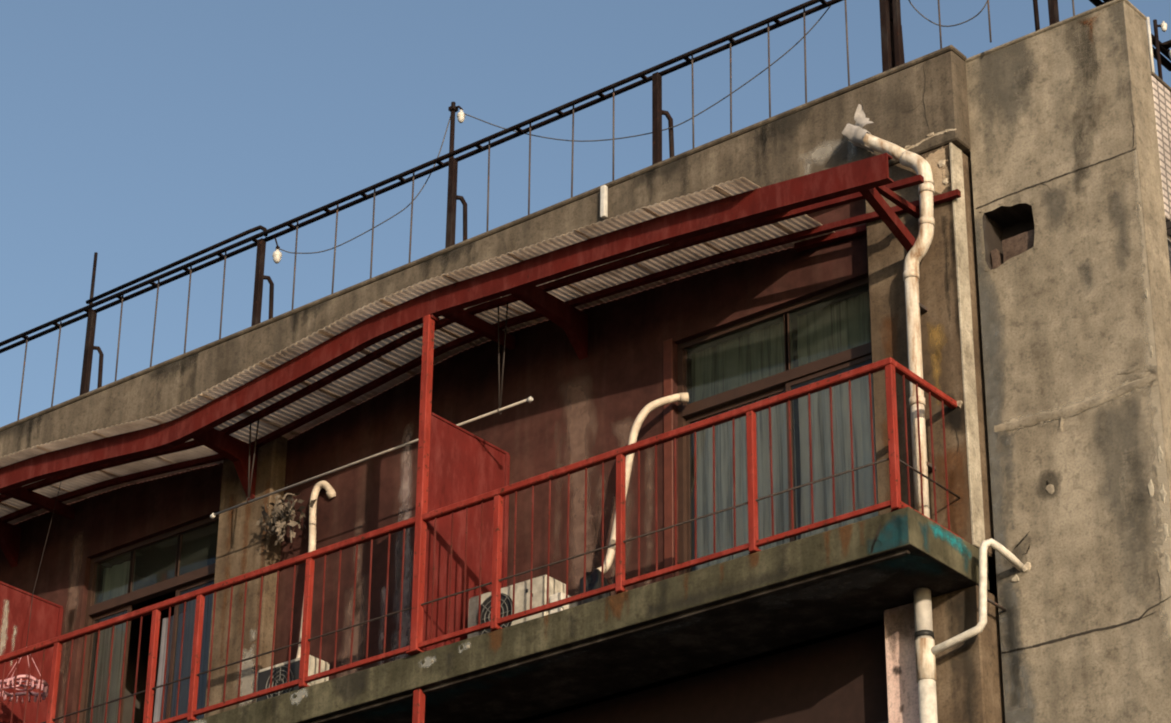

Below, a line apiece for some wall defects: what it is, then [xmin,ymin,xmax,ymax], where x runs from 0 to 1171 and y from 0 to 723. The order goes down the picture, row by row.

leakage [1112,1,1125,32]
hole [982,224,1038,273]
leakage [556,378,633,596]
spalling [1040,474,1058,495]
leakage [379,430,412,665]
crack [1002,569,1171,654]